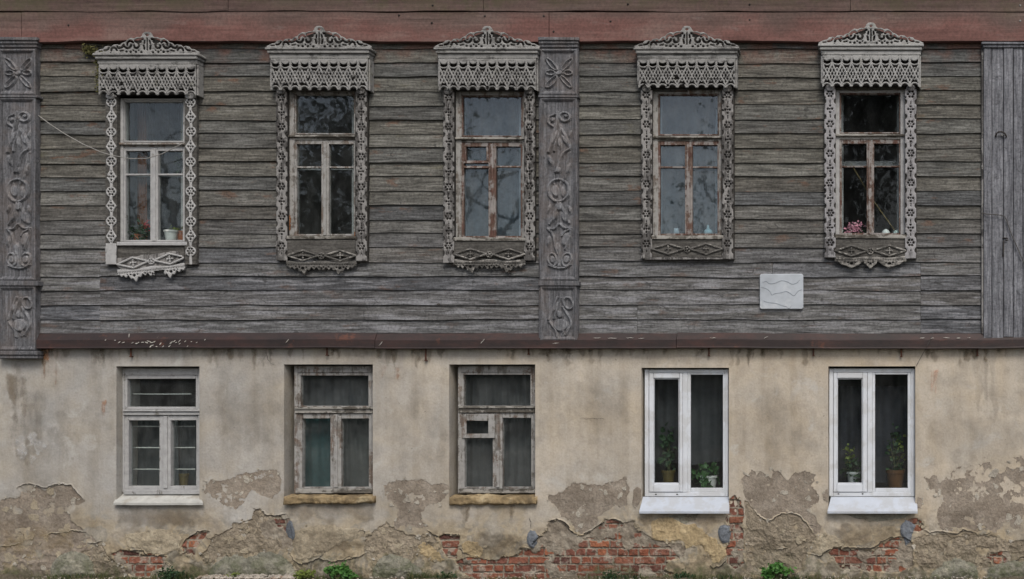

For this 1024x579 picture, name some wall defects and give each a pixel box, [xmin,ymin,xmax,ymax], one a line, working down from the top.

peeling [0,482,171,579]
spalling [179,468,293,566]
flaking render [364,477,686,579]
spalling [669,514,698,523]
spalling [724,467,828,577]
peeling [829,455,1024,574]